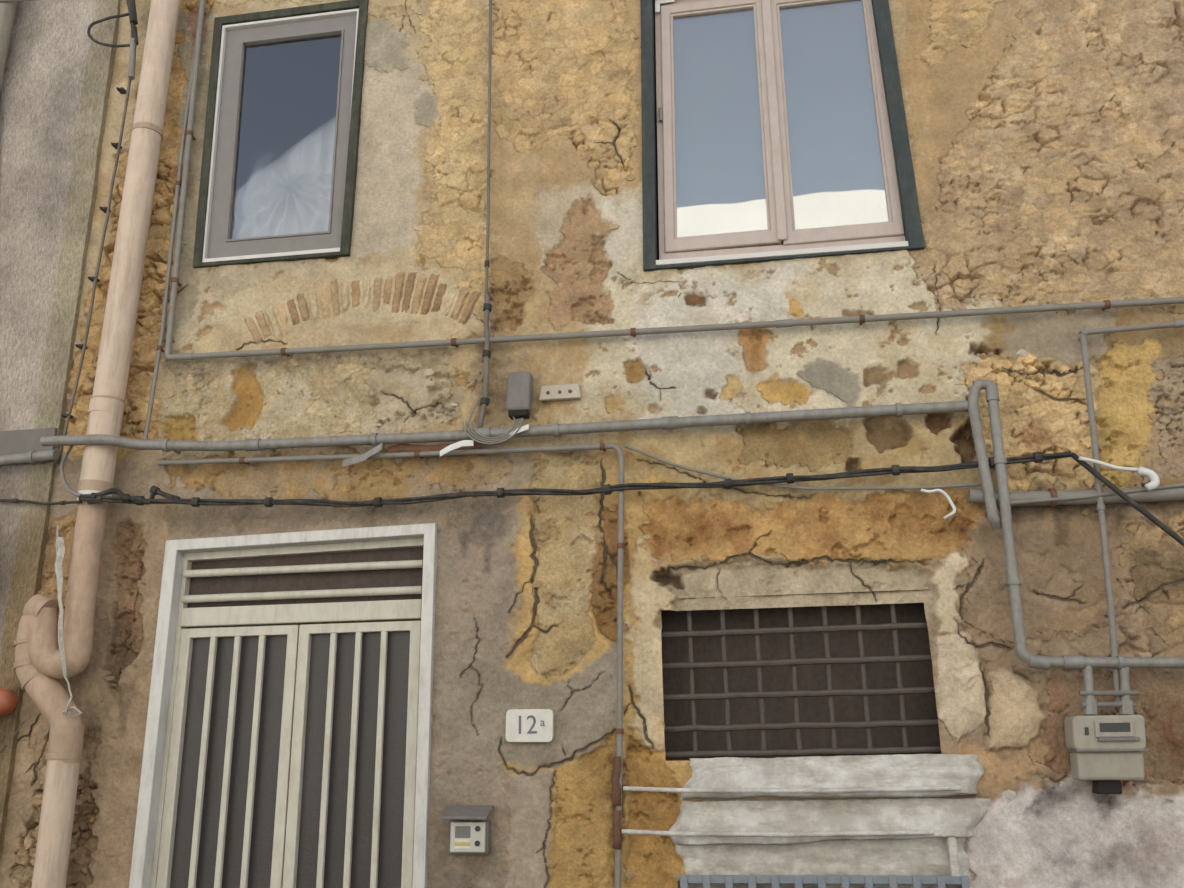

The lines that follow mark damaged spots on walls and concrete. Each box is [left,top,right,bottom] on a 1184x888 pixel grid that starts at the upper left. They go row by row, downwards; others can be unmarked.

flaking render [62,141,129,458]
flaking render [117,0,513,510]
flaking render [368,0,641,332]
flaking render [909,0,1184,317]
flaking render [925,337,1184,492]
crack [506,515,557,657]
crack [598,462,618,599]
flaking render [527,451,1015,678]
crack [654,531,926,601]
crack [0,714,49,786]
crack [460,619,653,888]
flaking render [546,732,683,888]